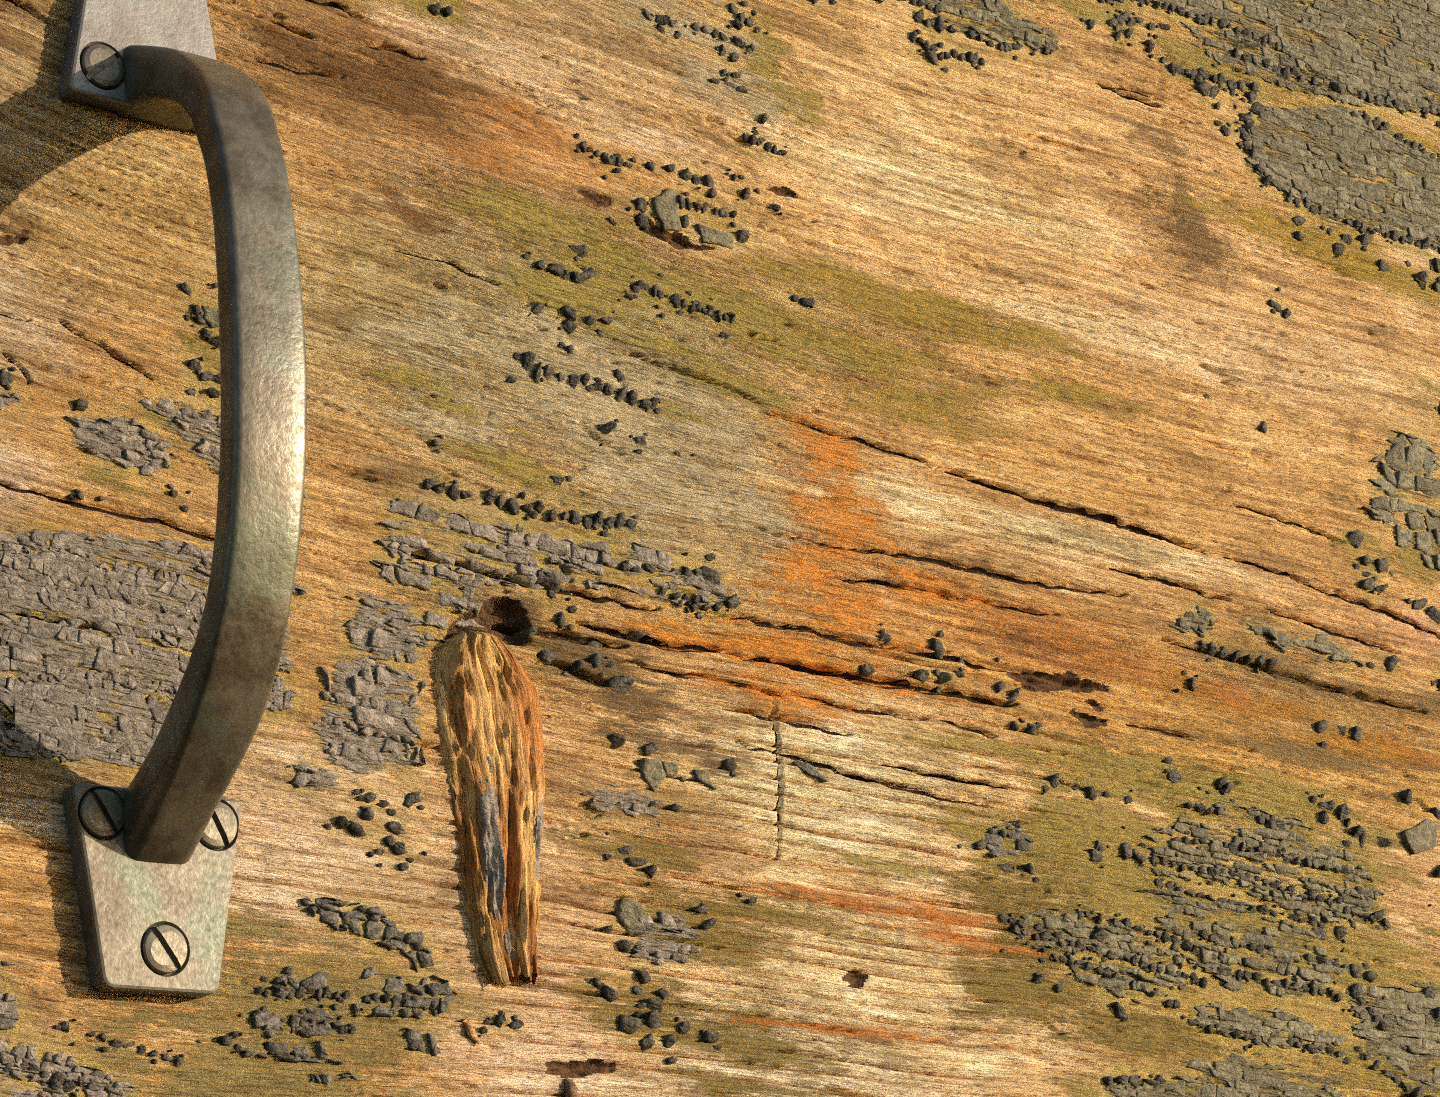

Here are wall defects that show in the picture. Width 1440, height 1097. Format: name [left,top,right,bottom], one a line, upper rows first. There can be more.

peeling [641,1,769,94]
peeling [875,0,1065,73]
peeling [574,133,783,249]
peeling [1080,0,1440,292]
peeling [64,282,221,512]
peeling [505,351,662,414]
peeling [1347,429,1440,595]
peeling [0,519,213,769]
peeling [287,478,742,886]
peeling [0,990,184,1097]
peeling [196,897,458,1085]
peeling [997,773,1440,1097]